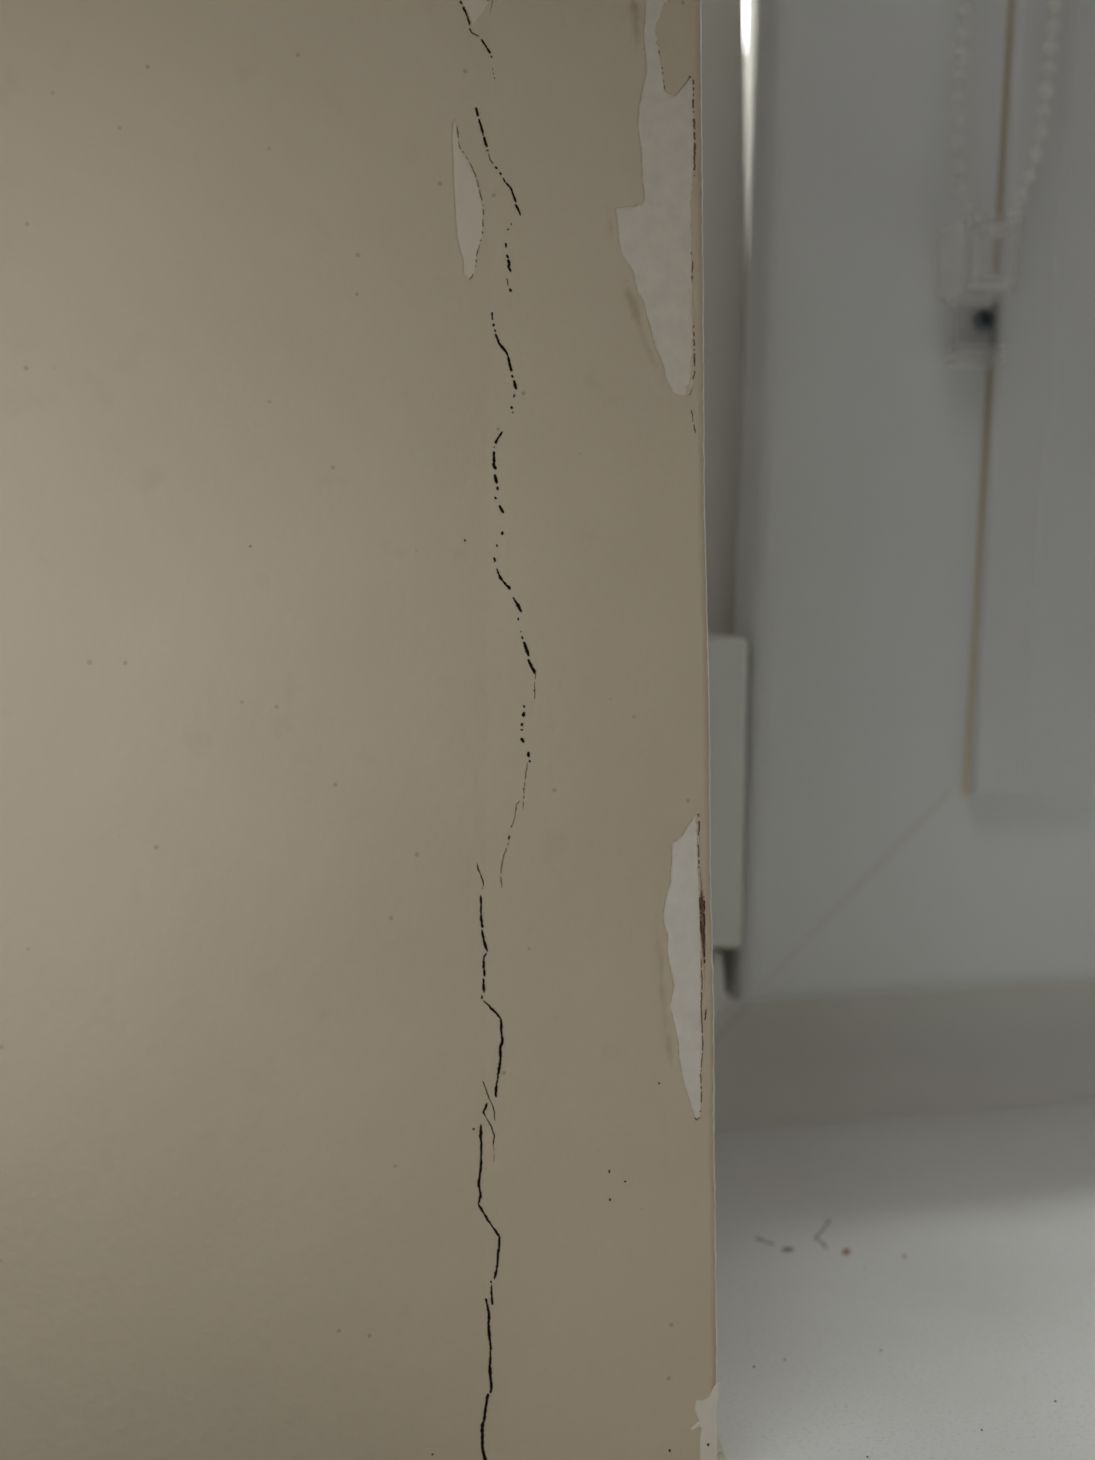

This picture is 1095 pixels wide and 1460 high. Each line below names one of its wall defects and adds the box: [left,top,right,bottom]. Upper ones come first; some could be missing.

peeling [451,120,484,280]
peeling [615,0,696,432]
crack [459,1,536,1460]
peeling [662,814,704,1121]